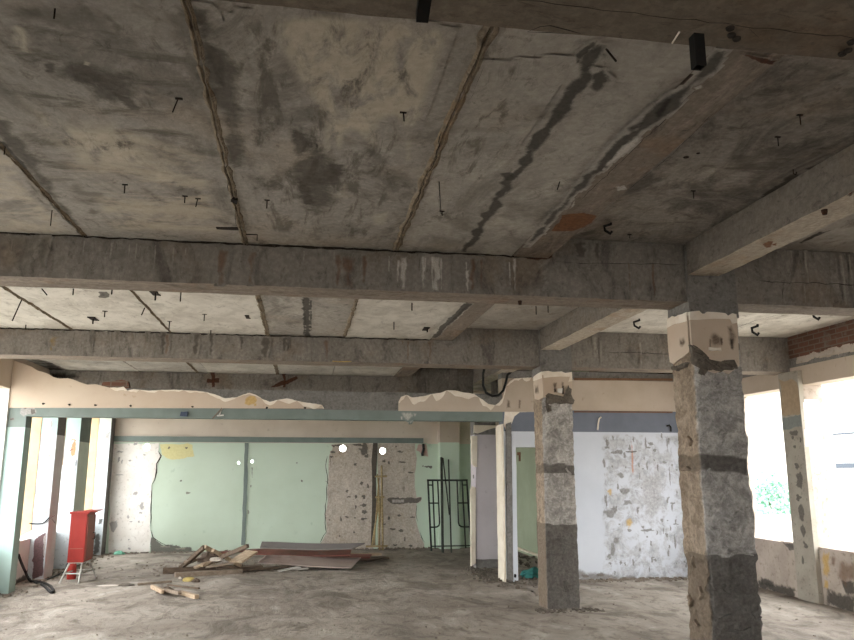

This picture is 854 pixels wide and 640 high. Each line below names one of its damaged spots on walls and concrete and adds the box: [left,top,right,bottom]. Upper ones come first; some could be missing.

damp [0,0,615,292]
crack [403,134,441,230]
corrosion [550,212,600,232]
damp [522,48,733,248]
flaking render [8,361,324,420]
flaking render [398,377,534,429]
spalling [546,385,575,412]
spalling [671,345,738,375]
peeling [778,378,822,453]
flaking render [102,428,195,553]
flaking render [321,443,433,549]
peeling [600,432,696,576]